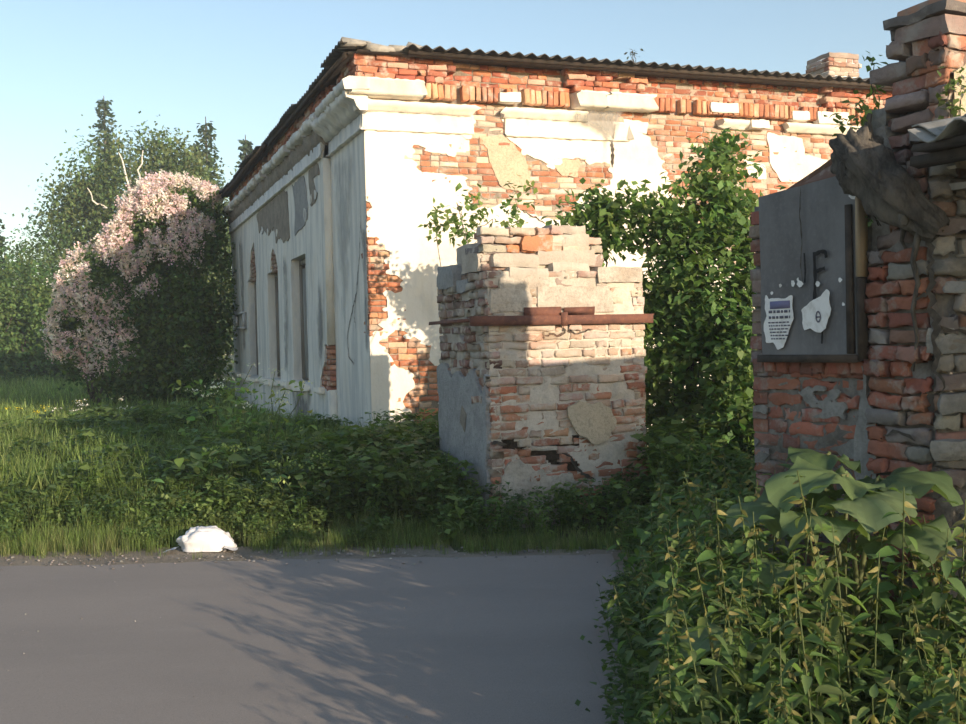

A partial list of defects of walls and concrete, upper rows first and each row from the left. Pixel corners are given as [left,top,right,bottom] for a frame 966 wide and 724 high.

peeling [257,163,320,274]
flaking render [404,103,612,220]
flaking render [321,344,337,391]
flaking render [361,196,439,427]
spalling [616,112,878,499]
spalling [758,483,877,566]